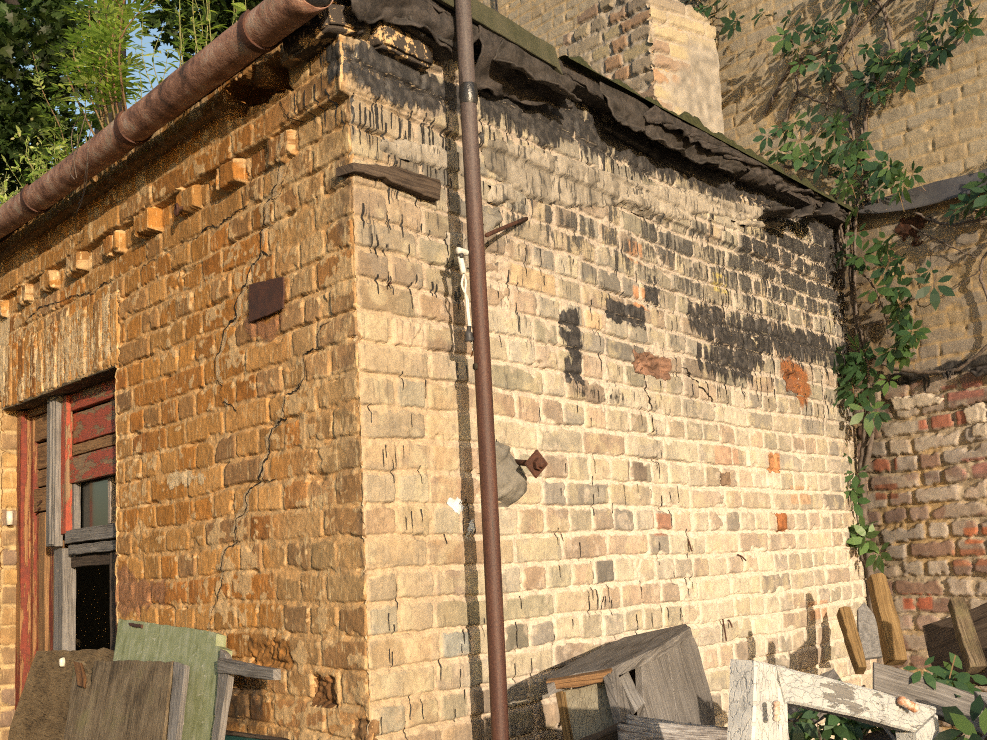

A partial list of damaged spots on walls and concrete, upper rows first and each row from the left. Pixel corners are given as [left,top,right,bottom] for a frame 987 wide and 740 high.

leakage [478,108,512,153]
leakage [385,186,410,262]
corrosion [244,315,282,342]
leakage [692,214,835,423]
corrosion [781,358,811,406]
crack [207,289,336,631]